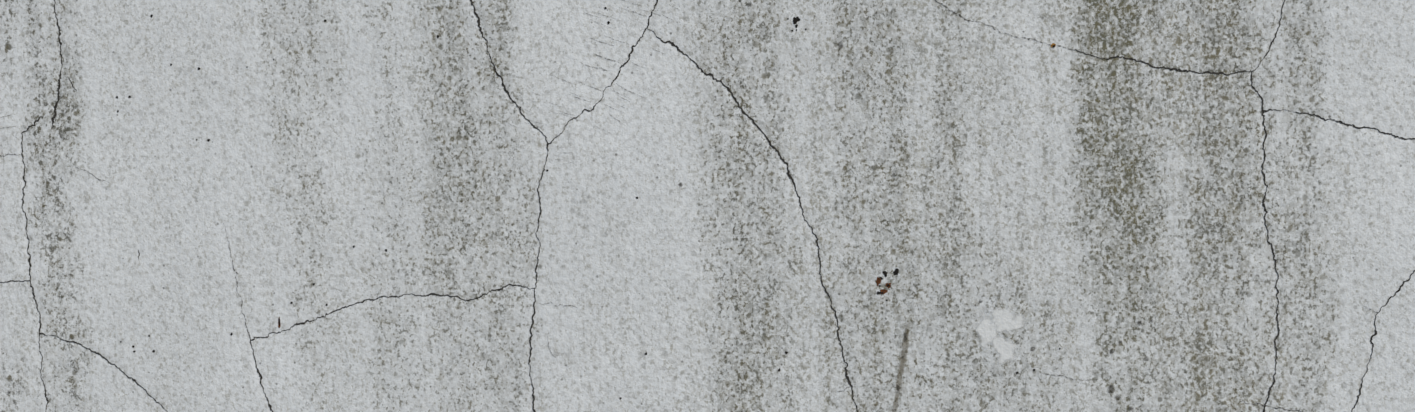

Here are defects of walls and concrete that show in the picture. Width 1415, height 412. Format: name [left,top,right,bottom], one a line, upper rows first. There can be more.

crack [0,0,168,412]
water stain [432,1,476,295]
water stain [485,1,510,86]
crack [225,0,858,412]
water stain [718,1,780,260]
water stain [836,1,868,105]
water stain [937,248,1024,405]
water stain [1076,0,1155,356]
crack [935,0,1415,412]
water stain [1191,0,1260,382]